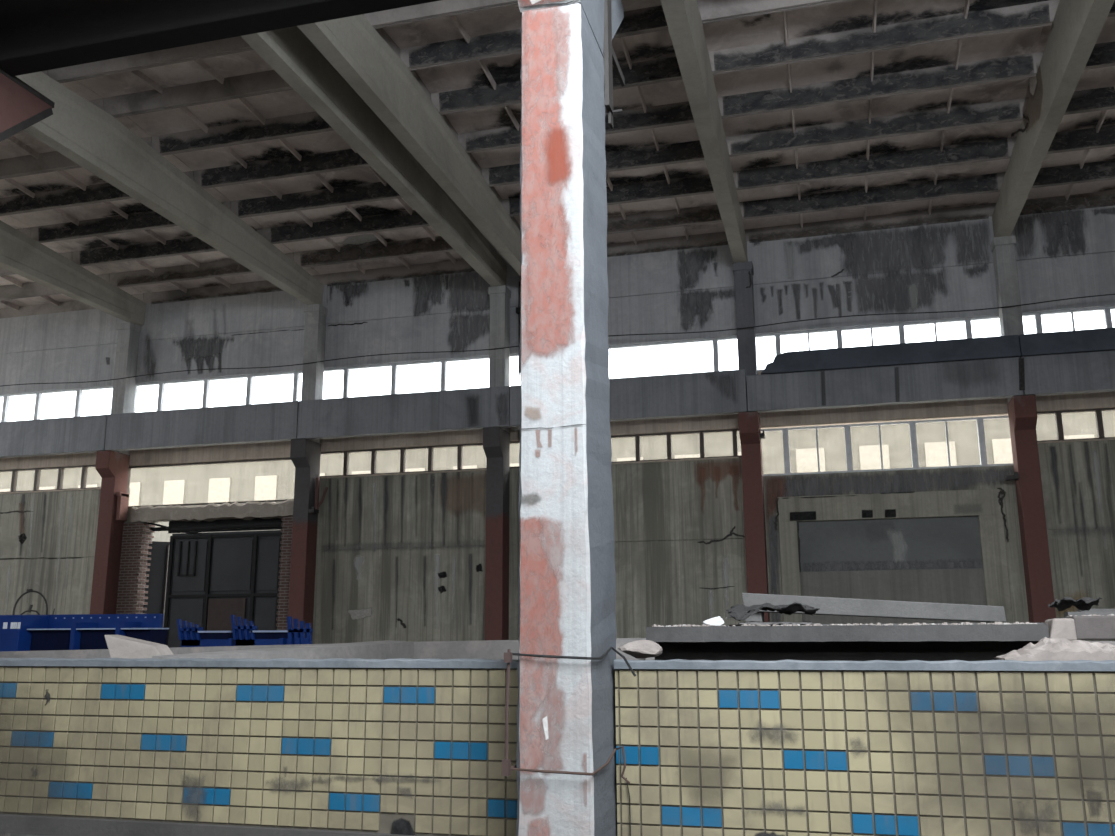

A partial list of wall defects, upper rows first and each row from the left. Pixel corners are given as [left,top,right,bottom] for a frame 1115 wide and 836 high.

leakage [723,56,1034,116]
leakage [714,0,1050,71]
leakage [1086,42,1115,67]
leakage [0,177,283,304]
leakage [159,117,490,353]
peeling [520,0,574,364]
leakage [732,100,1020,319]
leakage [1015,87,1115,257]
leakage [174,337,234,374]
crack [697,526,745,544]
crack [775,492,914,572]
peeling [520,517,564,836]